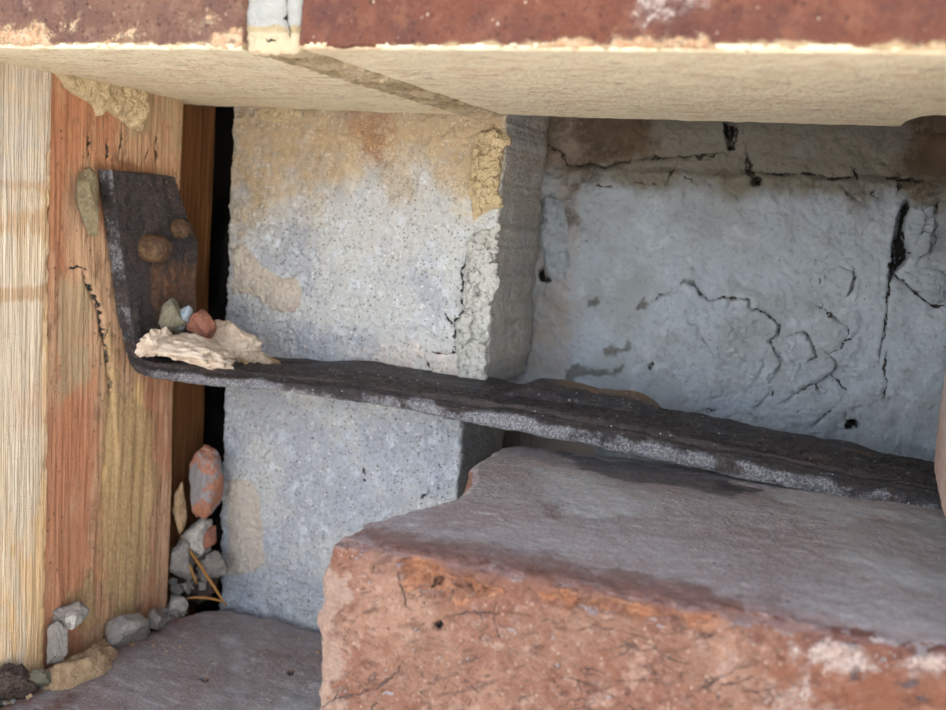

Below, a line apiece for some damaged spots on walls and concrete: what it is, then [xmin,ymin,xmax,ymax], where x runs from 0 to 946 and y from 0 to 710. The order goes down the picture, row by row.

crack [547,128,923,199]
crack [424,259,466,368]
rust [290,360,660,415]
crack [692,278,855,421]
rust [668,412,884,454]
crack [879,252,945,399]